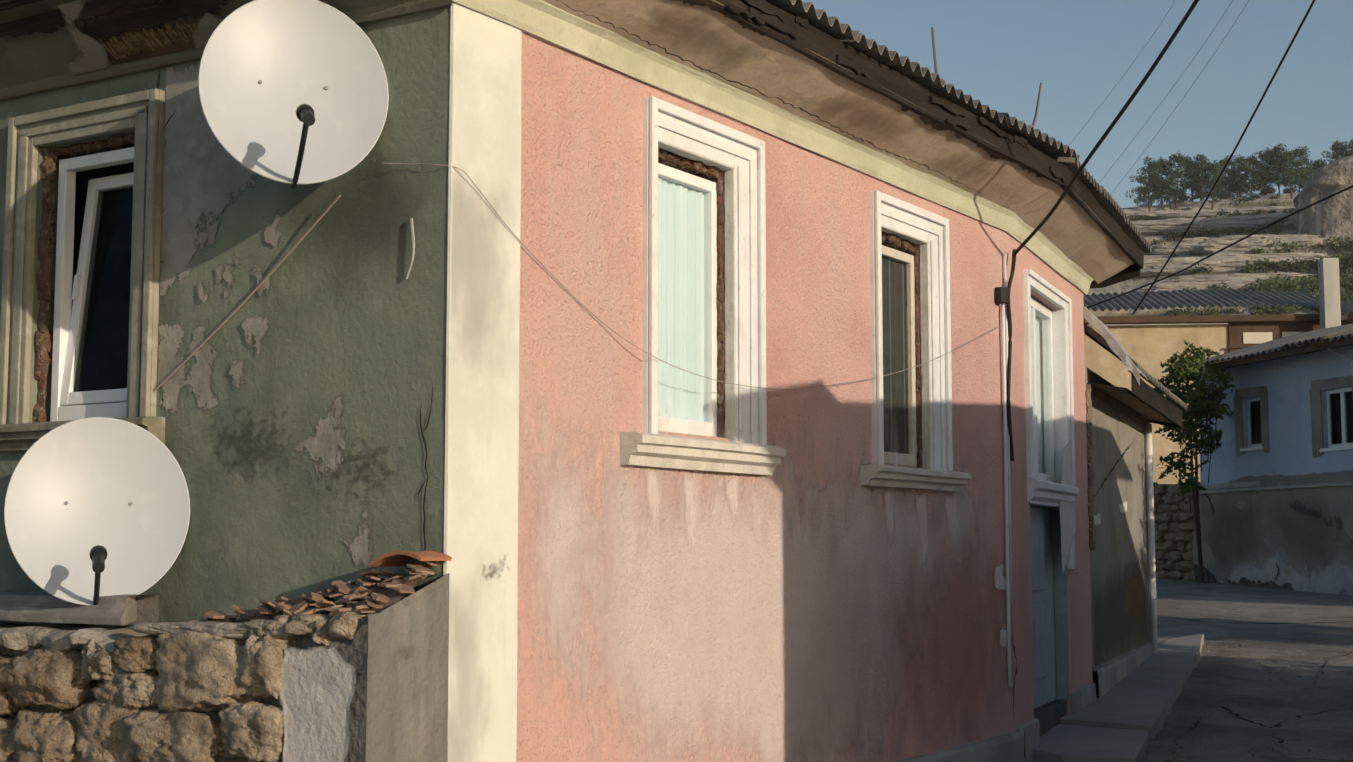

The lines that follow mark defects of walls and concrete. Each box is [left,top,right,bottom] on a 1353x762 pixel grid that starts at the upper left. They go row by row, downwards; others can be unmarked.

peeling [0,0,278,418]
peeling [264,214,282,247]
peeling [295,392,351,480]
leakage [727,479,737,510]
peeling [343,509,373,568]
spalling [1193,563,1293,590]
crack [1164,621,1352,762]